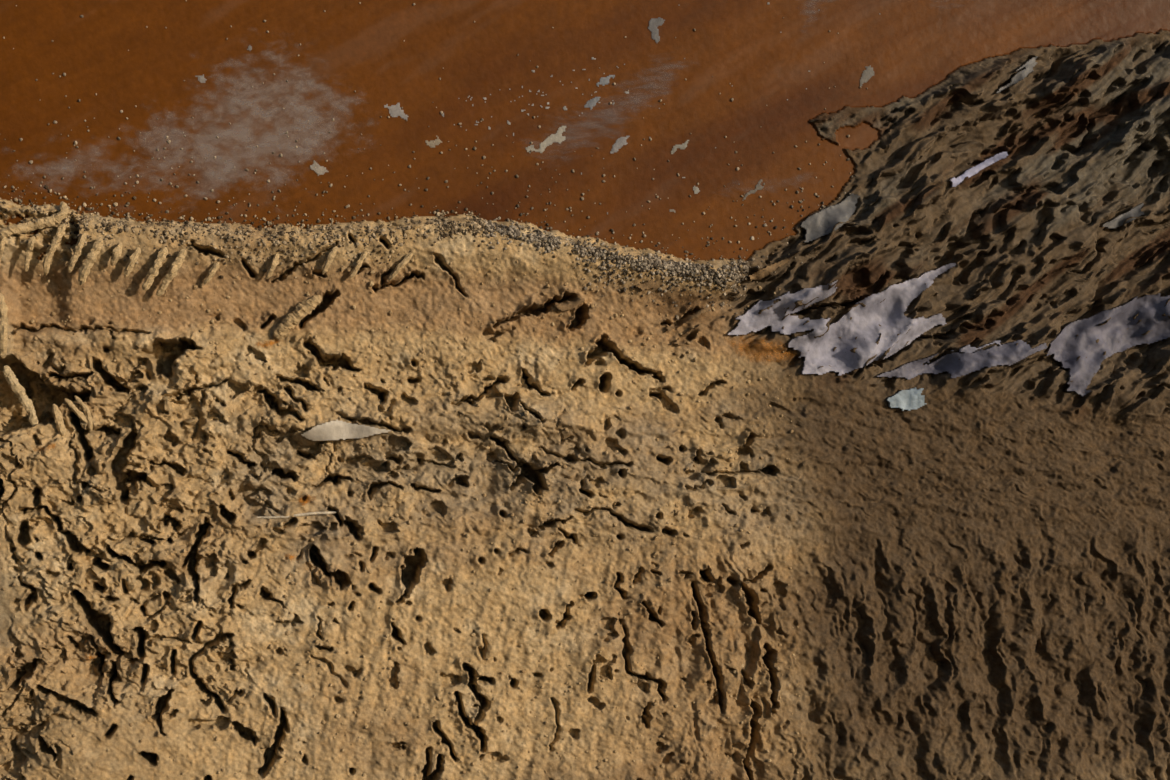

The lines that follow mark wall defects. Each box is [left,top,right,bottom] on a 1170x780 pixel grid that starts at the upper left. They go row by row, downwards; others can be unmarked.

peeling [949,152,1008,187]
crack [8,322,152,337]
peeling [727,263,1170,411]
spalling [337,416,413,435]
crack [538,446,633,471]
crack [574,508,654,535]
crack [187,633,245,716]
crack [622,624,668,705]
crack [691,582,727,717]
crack [421,747,445,780]